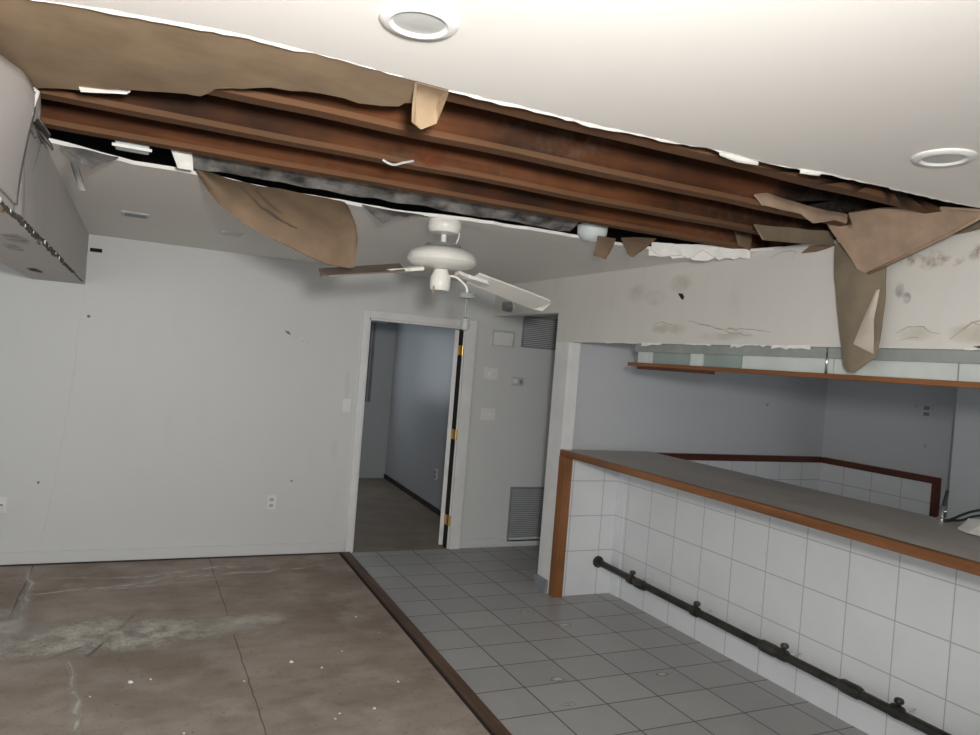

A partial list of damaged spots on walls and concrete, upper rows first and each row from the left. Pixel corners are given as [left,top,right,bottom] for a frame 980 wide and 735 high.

peeling [0,0,759,165]
spalling [772,164,980,275]